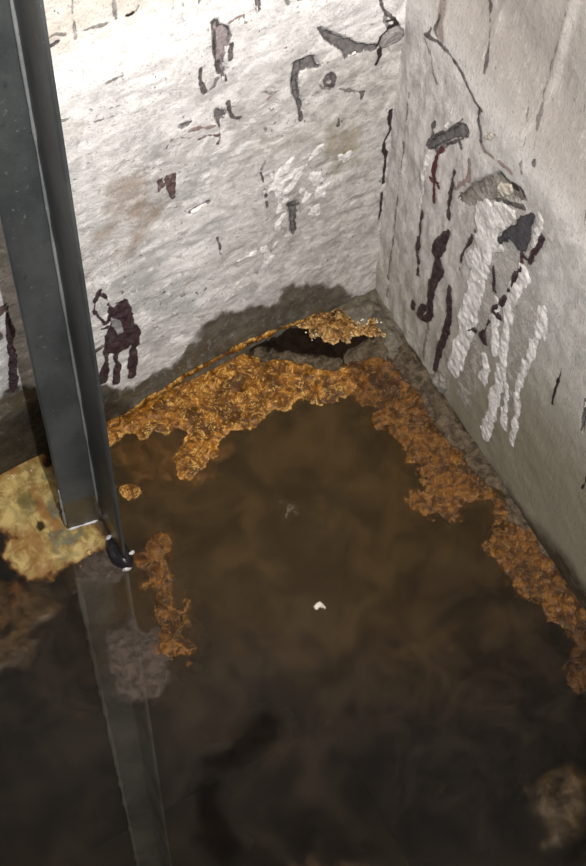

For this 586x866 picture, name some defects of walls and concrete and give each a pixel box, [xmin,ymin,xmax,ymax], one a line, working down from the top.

spalling [198,14,247,95]
spalling [317,19,404,65]
crack [379,0,400,28]
crack [424,0,556,175]
crack [378,93,410,298]
rust [418,145,445,209]
spalling [458,173,545,321]
rust [0,303,19,392]
rust [92,289,141,385]
leakage [101,283,357,422]
leakage [447,158,550,447]
leakage [0,385,49,475]